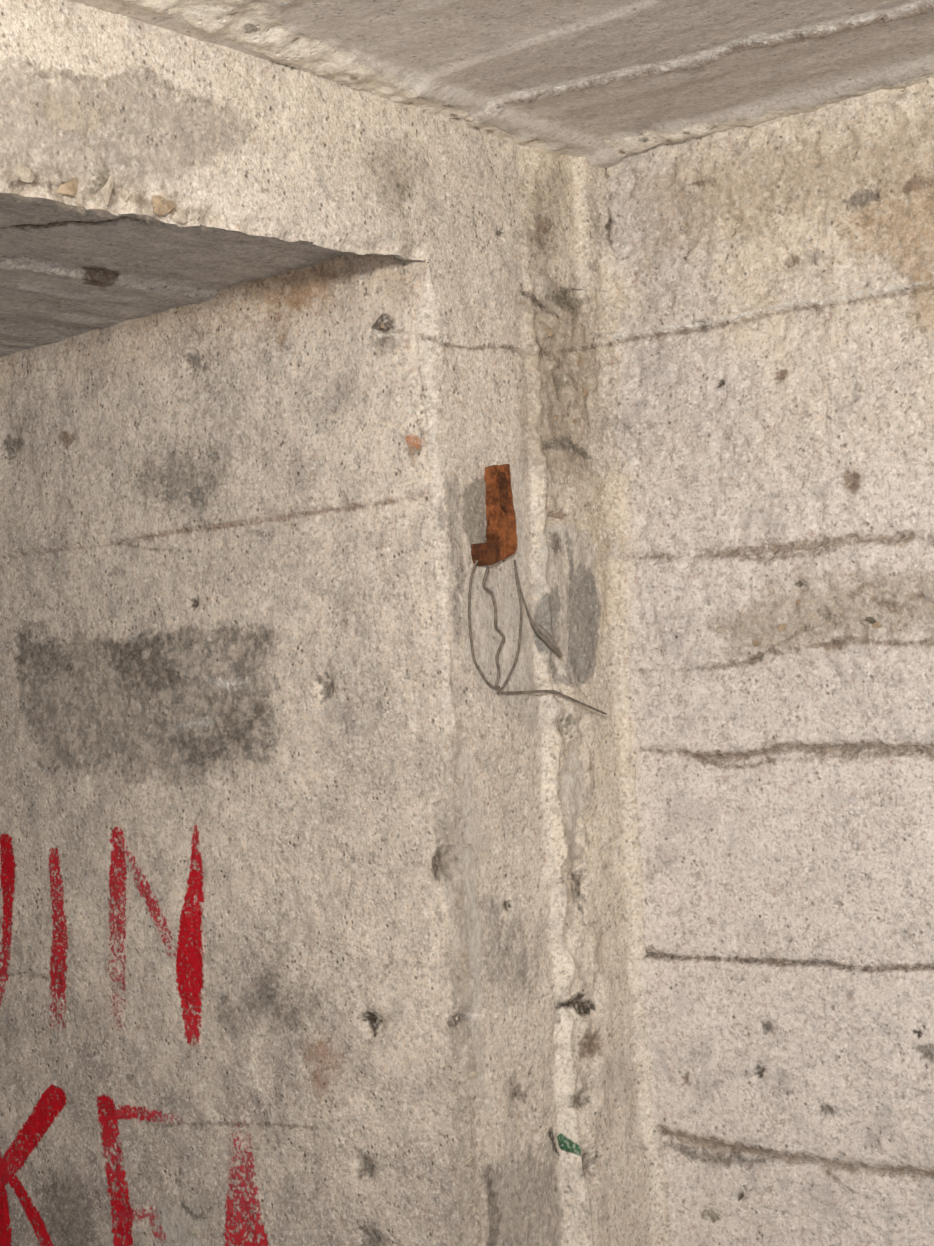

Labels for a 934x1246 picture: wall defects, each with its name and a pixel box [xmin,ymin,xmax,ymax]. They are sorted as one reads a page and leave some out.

rust [497,472,508,515]
crack [633,532,921,562]
leakage [463,456,600,719]
leakage [20,624,279,779]
crack [648,741,934,770]
crack [645,946,934,972]
crack [662,1126,934,1191]